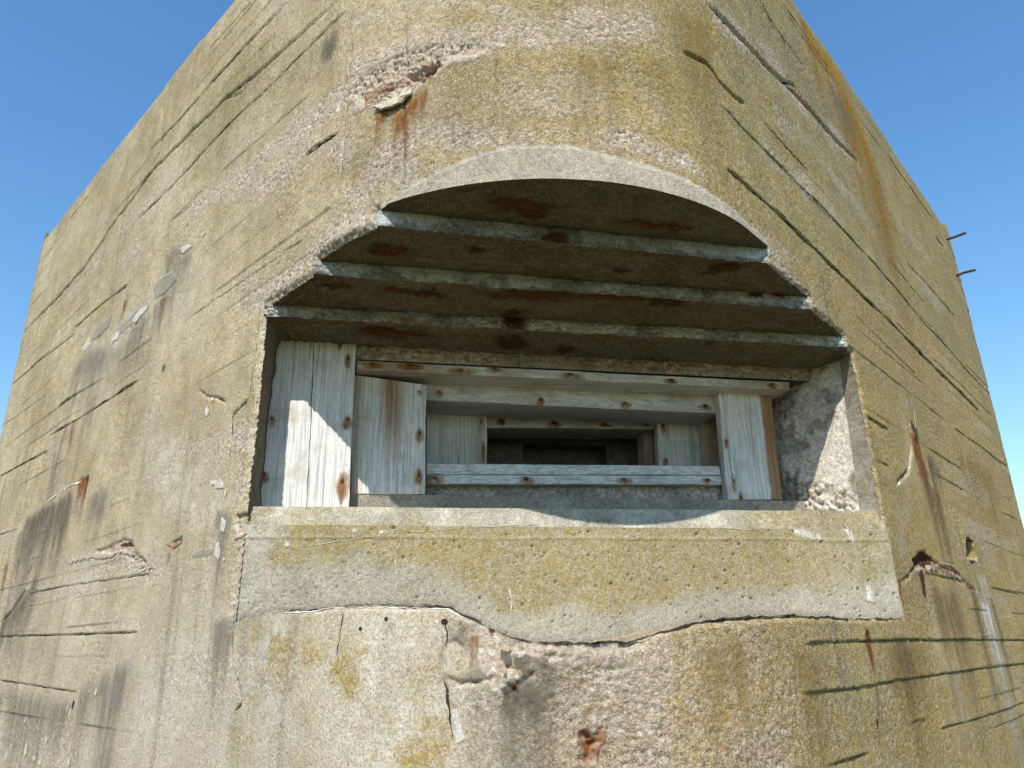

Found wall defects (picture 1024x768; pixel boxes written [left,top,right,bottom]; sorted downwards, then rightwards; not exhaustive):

spalling [344,33,510,114]
corrosion [376,89,426,150]
corrosion [490,290,682,349]
corrosion [78,476,89,500]
corrosion [909,421,945,536]
damp [13,496,71,569]
spalling [66,540,153,571]
corrosion [899,550,972,598]
spalling [459,620,627,706]
crack [277,524,896,742]
corrosion [866,629,875,667]
damp [4,667,125,765]